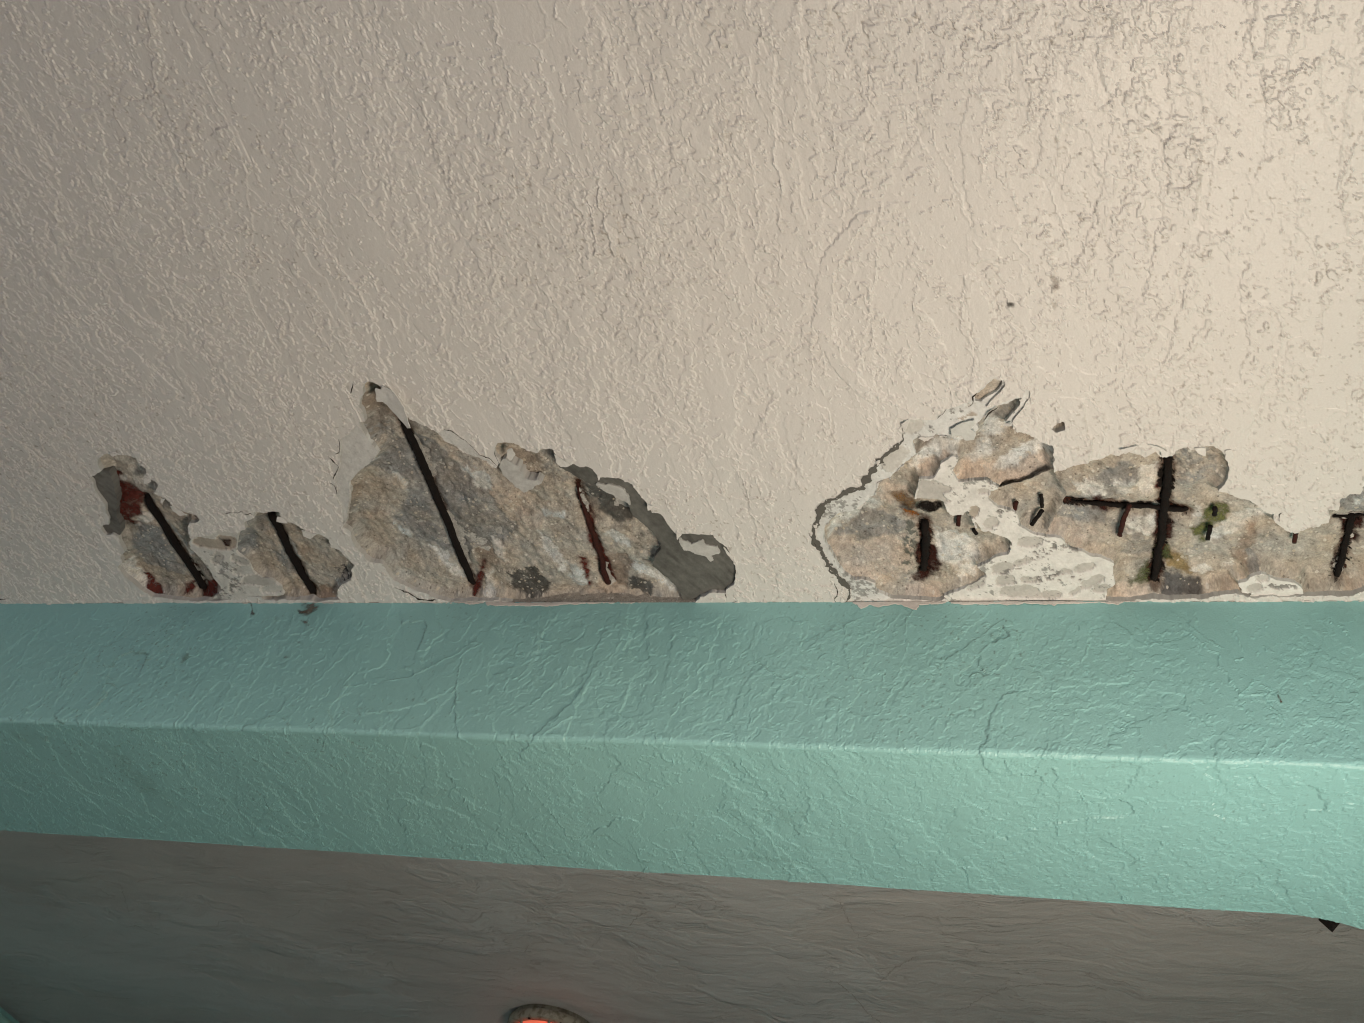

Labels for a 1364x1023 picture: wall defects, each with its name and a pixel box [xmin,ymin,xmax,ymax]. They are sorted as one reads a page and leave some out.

spalling [93,452,354,604]
spalling [346,382,736,607]
spalling [817,379,1364,610]